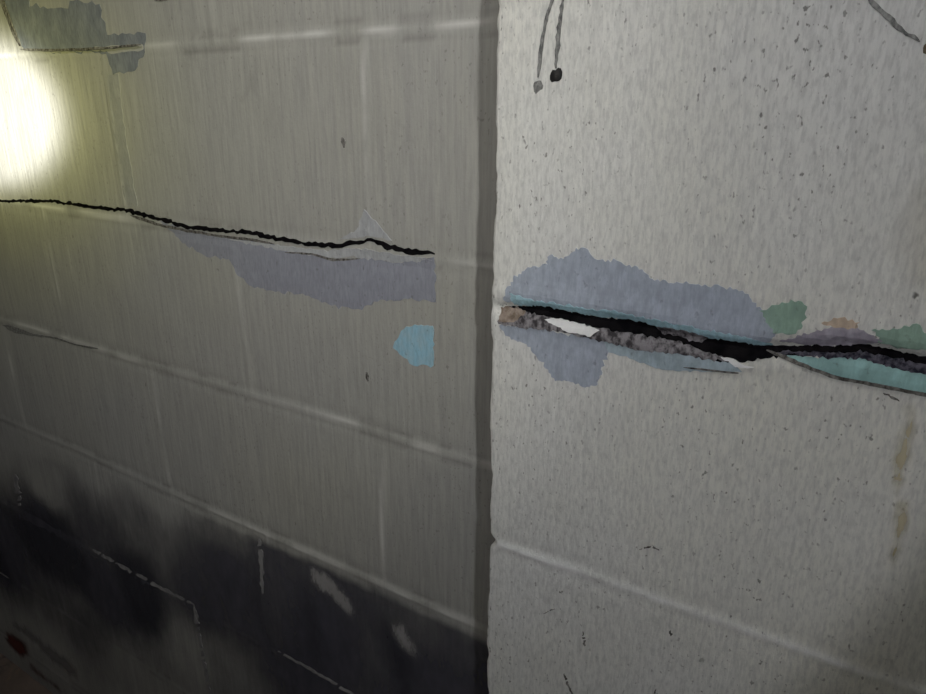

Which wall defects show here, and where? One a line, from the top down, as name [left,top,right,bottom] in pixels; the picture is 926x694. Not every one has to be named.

peeling [4,0,146,208]
crack [0,198,435,261]
peeling [160,210,436,310]
crack [3,325,98,349]
peeling [393,325,434,368]
crack [497,305,926,401]
peeling [499,247,926,393]
leakage [0,474,489,694]